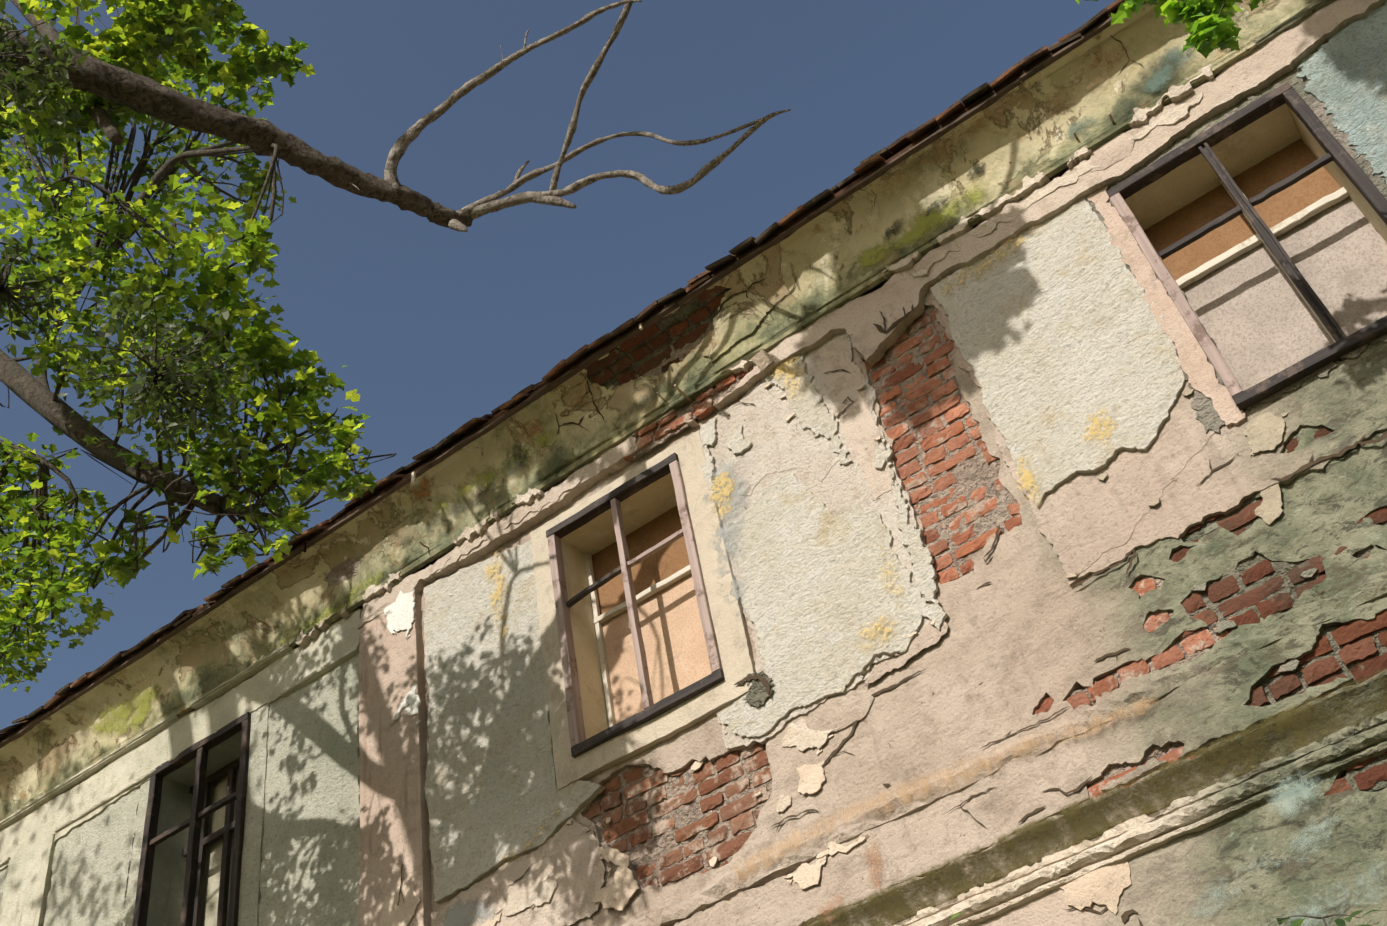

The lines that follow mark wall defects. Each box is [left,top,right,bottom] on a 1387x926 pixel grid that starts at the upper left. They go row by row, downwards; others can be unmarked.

water stain [1067,47,1191,138]
spalling [587,286,771,387]
crack [717,276,797,318]
water stain [771,357,805,397]
spalling [719,306,1215,584]
peeling [1243,412,1333,456]
spalling [1131,483,1283,598]
peeling [384,588,416,640]
water stain [485,553,507,646]
spalling [1034,546,1387,714]
spalling [1324,751,1387,796]
spalling [380,719,838,926]